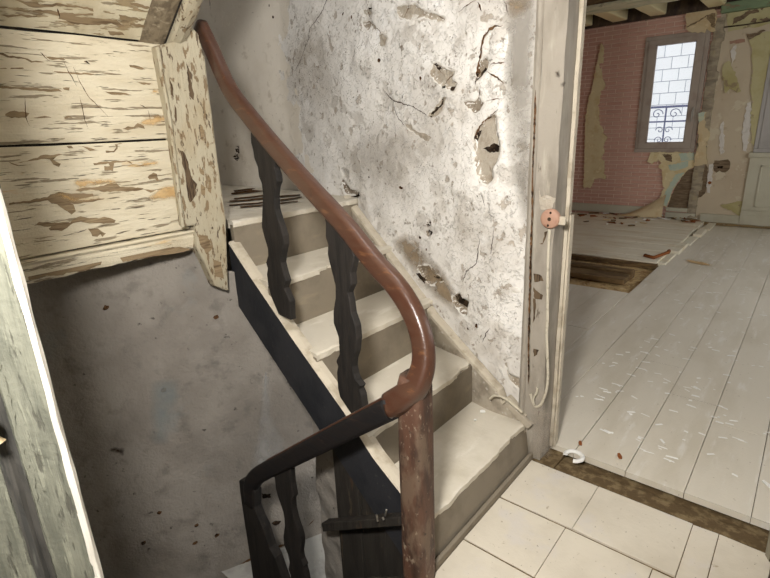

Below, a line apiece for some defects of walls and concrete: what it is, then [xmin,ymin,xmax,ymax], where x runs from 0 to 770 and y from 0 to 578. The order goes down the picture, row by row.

peeling [0,0,145,36]
flaking render [396,2,447,27]
crack [459,0,508,96]
peeling [186,63,194,100]
crack [383,89,426,125]
flaking render [419,61,458,119]
peeling [93,143,132,171]
flaking render [464,91,504,188]
flaking render [616,152,730,218]
peeling [9,173,162,237]
peeling [120,247,190,262]
flaking render [453,292,470,316]